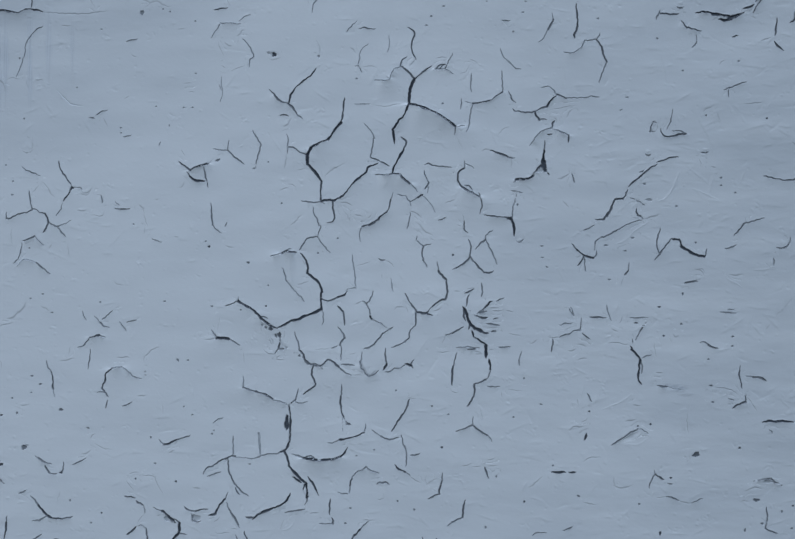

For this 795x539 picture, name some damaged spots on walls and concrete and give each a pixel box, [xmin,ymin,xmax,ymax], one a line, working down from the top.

crack [650,4,749,55]
crack [755,14,791,58]
crack [718,75,752,102]
crack [1,157,108,280]
peeling [172,153,229,193]
crack [565,105,770,291]
crack [154,0,654,539]
crack [73,304,146,414]
crack [0,449,78,539]
crack [121,522,145,539]